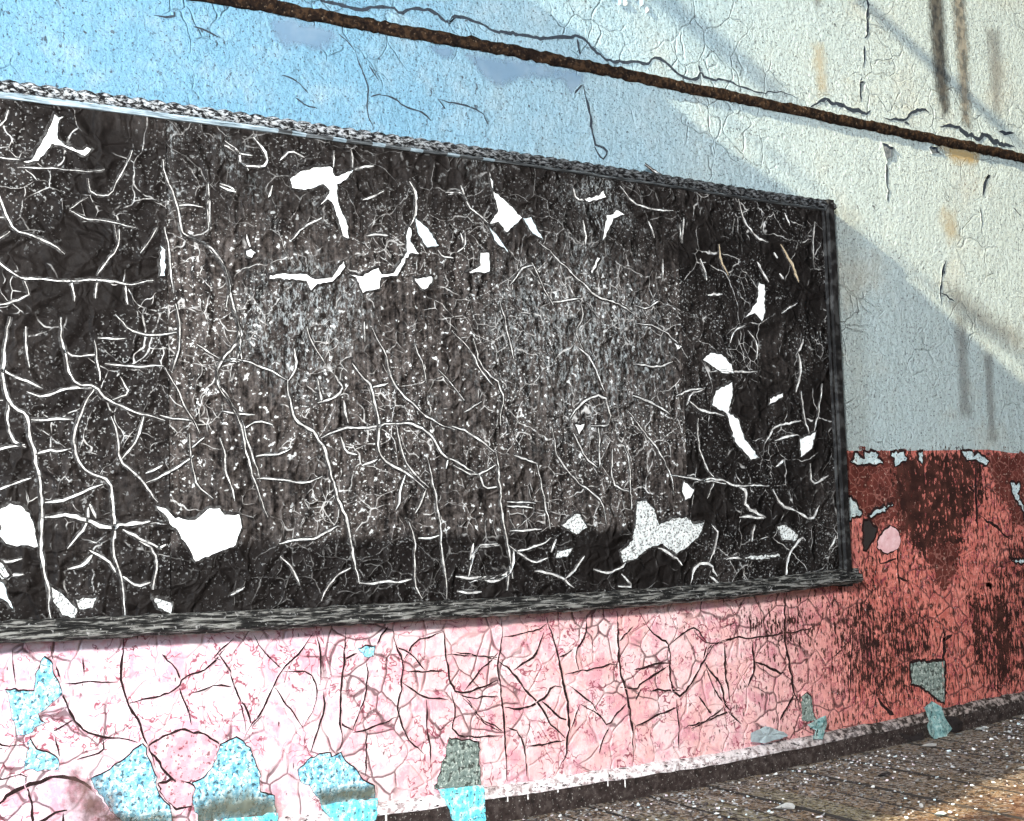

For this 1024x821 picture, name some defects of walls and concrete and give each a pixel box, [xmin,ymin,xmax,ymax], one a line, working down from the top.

crack [309,0,1014,148]
corrosion [929,0,971,128]
crack [0,110,10,128]
crack [574,84,608,161]
corrosion [950,148,974,162]
peeling [288,164,355,240]
crack [979,173,990,227]
peeling [701,350,761,462]
crack [0,137,837,821]
peeling [154,504,243,563]
peeling [618,498,705,564]
peeling [730,445,1024,717]